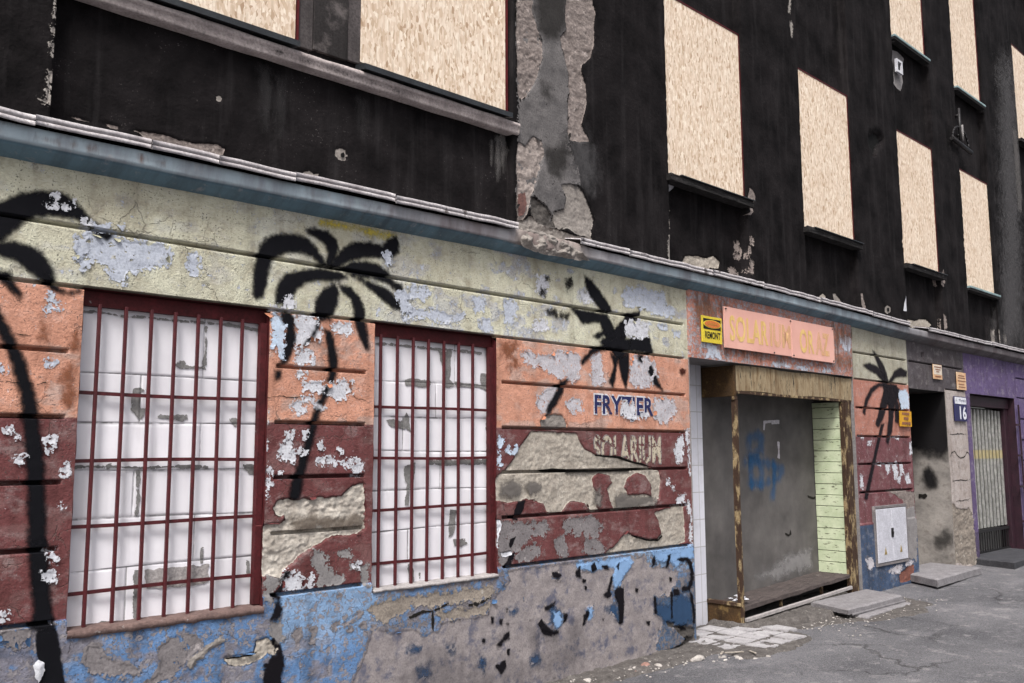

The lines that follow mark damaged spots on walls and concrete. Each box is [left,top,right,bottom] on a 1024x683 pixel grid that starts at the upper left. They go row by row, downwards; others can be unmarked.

flaking render [515,0,543,102]
flaking render [560,0,596,142]
peeling [46,191,204,287]
flaking render [516,137,595,246]
flaking render [667,210,754,275]
peeling [394,283,519,333]
peeling [621,285,681,340]
peeling [1,424,30,465]
peeling [41,434,59,456]
peeling [58,460,72,479]
flaking render [257,293,366,594]
flaking render [490,340,693,561]